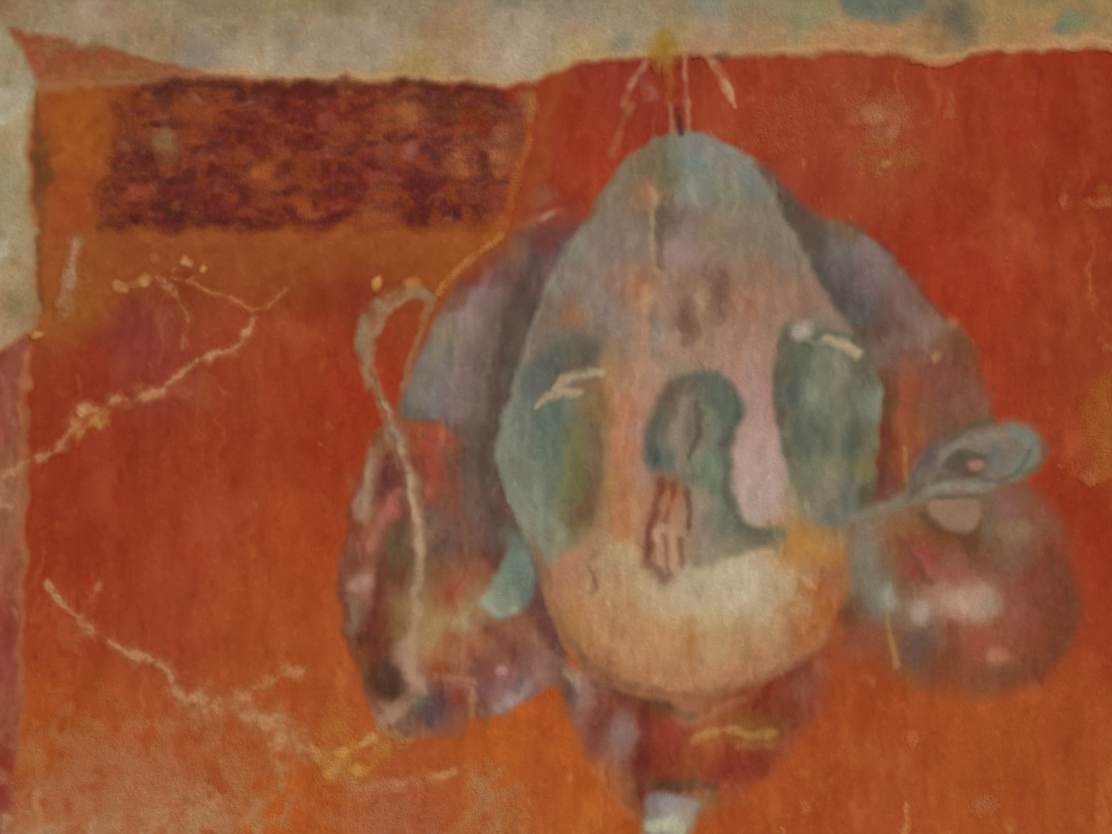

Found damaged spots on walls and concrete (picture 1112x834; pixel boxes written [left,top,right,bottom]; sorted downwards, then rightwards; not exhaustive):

peeling [0,0,1112,354]
crack [0,269,293,520]
crack [40,572,470,805]